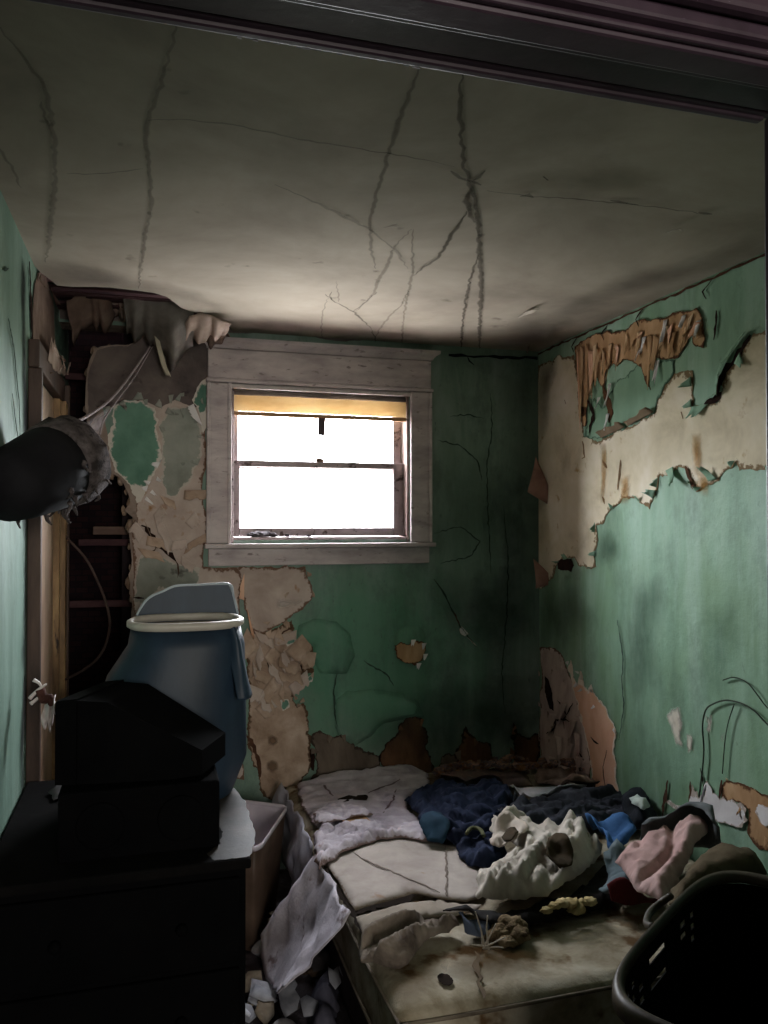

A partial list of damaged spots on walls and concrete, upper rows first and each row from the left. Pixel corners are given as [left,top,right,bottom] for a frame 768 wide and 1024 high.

spalling [65,330,316,800]
crack [434,397,509,707]
peeling [535,330,767,589]
peeling [538,647,619,791]
peeling [666,778,768,851]